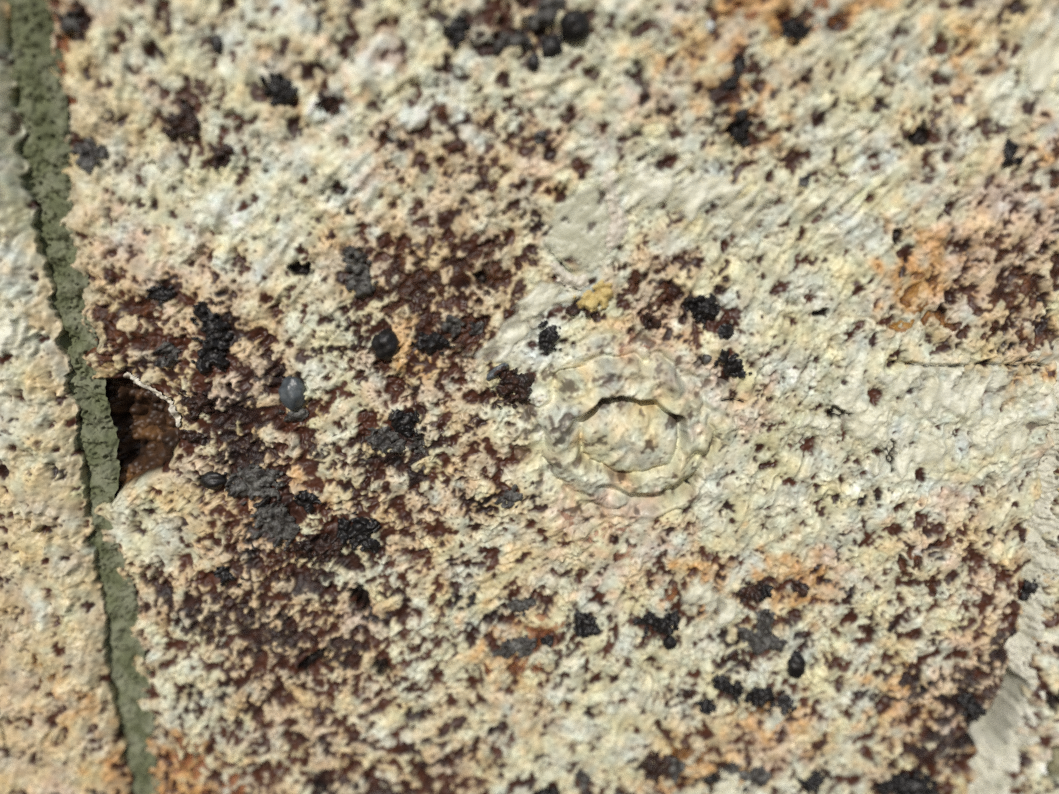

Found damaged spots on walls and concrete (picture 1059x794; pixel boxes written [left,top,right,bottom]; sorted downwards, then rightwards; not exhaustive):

spalling [105,372,181,497]